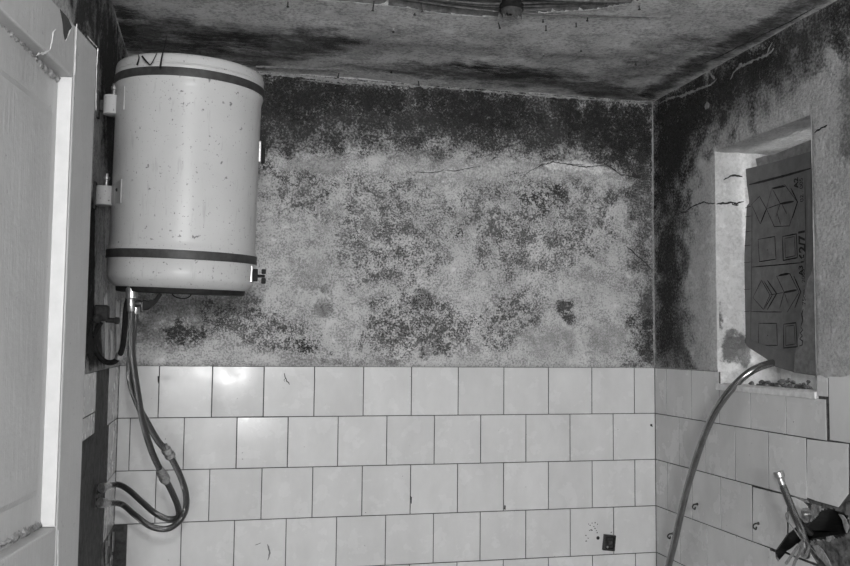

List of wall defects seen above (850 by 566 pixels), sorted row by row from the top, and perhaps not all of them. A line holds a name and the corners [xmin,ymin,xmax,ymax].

damp [256,0,850,369]
crack [680,201,744,214]
mould [163,298,332,355]